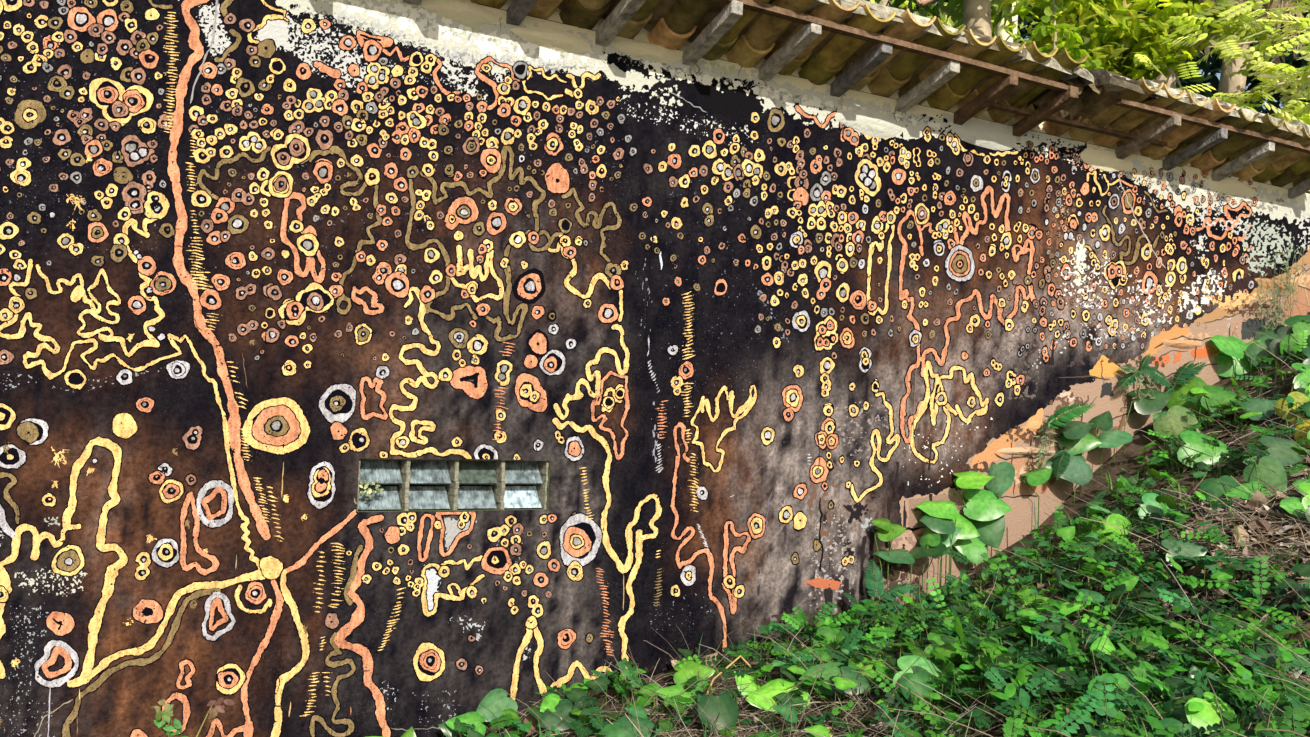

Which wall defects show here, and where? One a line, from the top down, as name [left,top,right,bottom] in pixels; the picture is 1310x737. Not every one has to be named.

peeling [196,3,231,57]
flaking render [254,0,1310,227]
flaking render [799,245,1310,615]